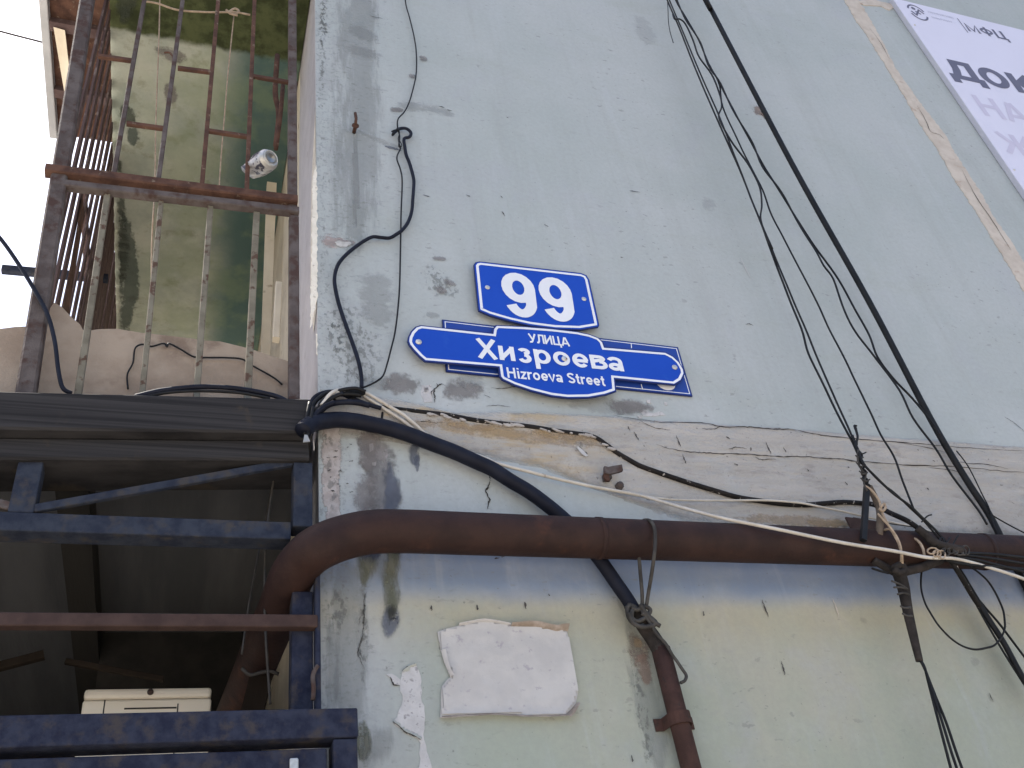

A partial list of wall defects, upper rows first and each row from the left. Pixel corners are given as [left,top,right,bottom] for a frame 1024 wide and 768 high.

leakage [327,432,401,511]
crack [621,416,1023,472]
leakage [360,553,399,635]
peeling [386,664,432,768]